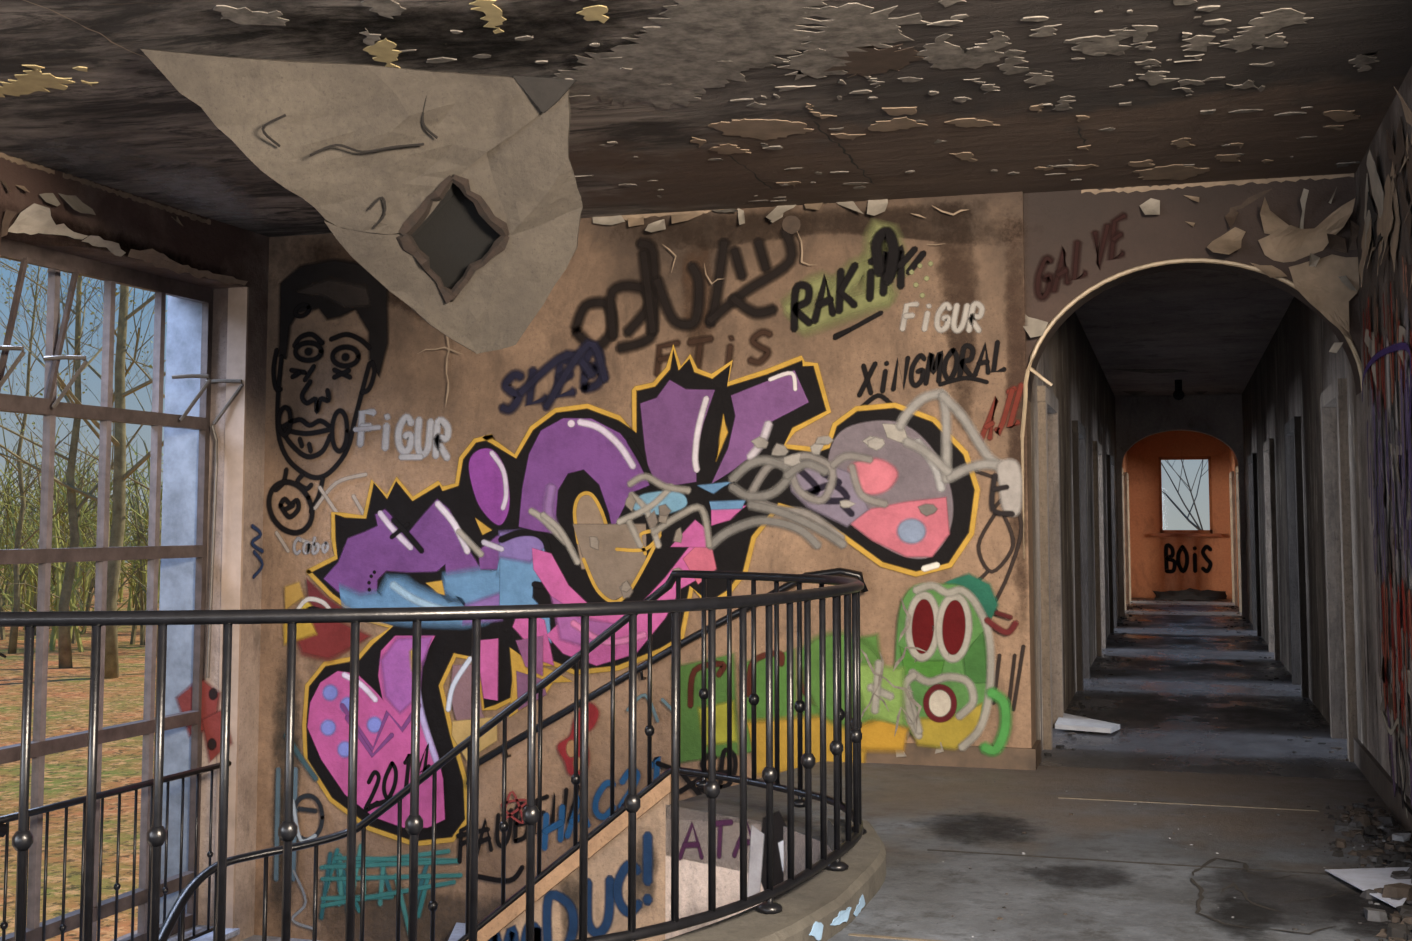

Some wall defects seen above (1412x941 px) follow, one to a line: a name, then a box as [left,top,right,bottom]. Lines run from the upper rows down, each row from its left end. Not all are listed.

peeling [213,5,289,26]
peeling [361,0,406,19]
peeling [469,0,533,41]
peeling [360,28,491,68]
peeling [0,65,98,97]
peeling [535,0,1314,162]
peeling [0,152,248,285]
peeling [592,168,888,234]
peeling [991,87,1412,389]
leakage [934,815,1030,841]
leakage [1032,867,1126,887]
leakage [1214,871,1398,937]